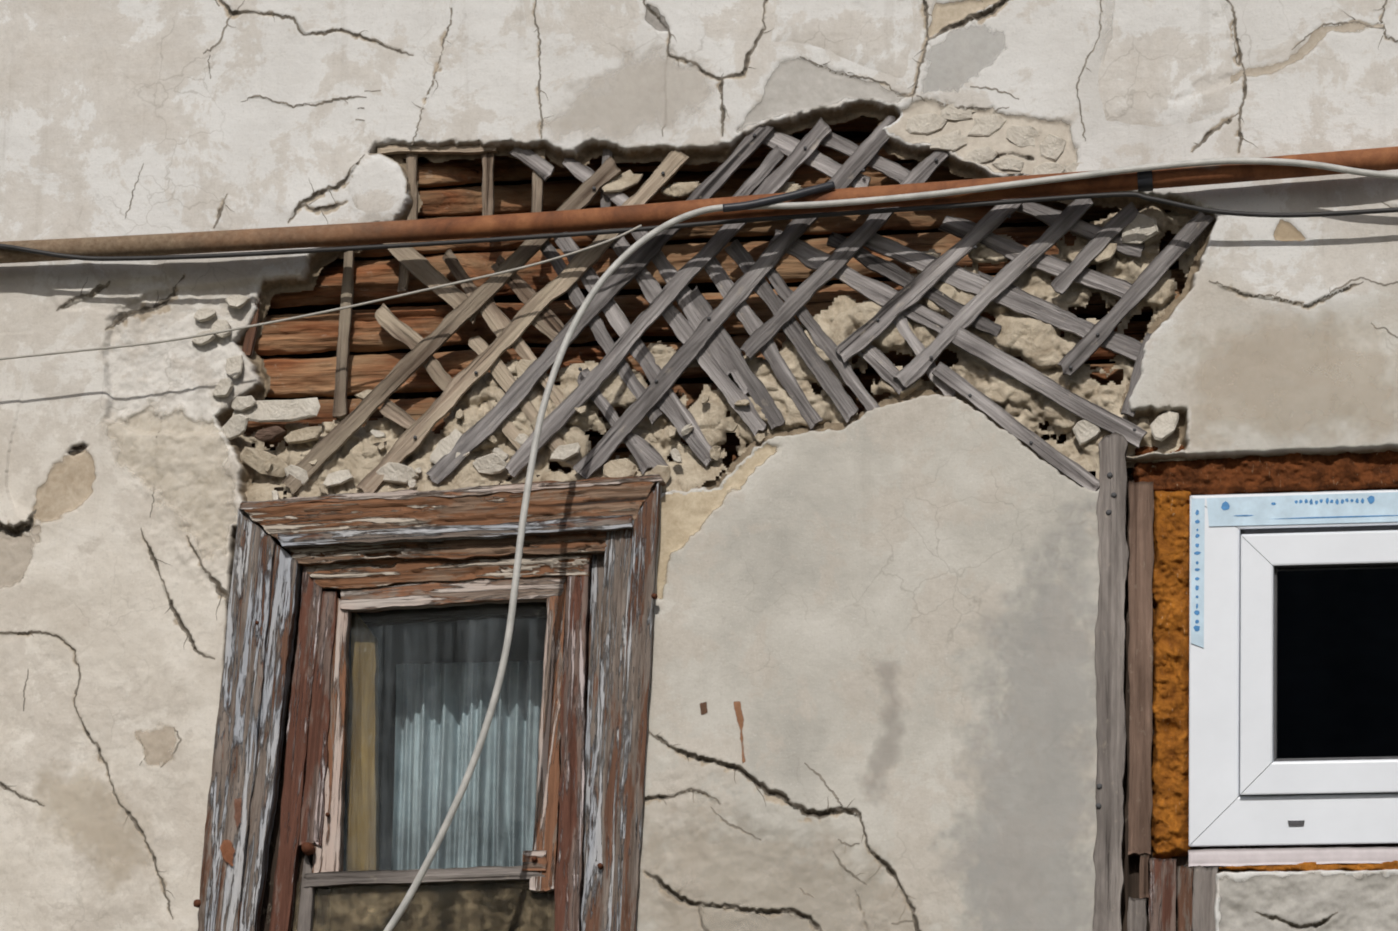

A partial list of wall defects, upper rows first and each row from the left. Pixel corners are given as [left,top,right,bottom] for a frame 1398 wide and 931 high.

crack [203,0,452,145]
crack [643,0,771,136]
crack [800,0,1019,113]
crack [288,154,365,223]
spalling [602,170,643,193]
spalling [1013,203,1206,335]
spalling [918,281,1197,462]
peeling [0,444,96,588]
crack [141,488,229,659]
spalling [108,294,1112,599]
crack [644,731,920,931]
peeling [1219,873,1398,931]